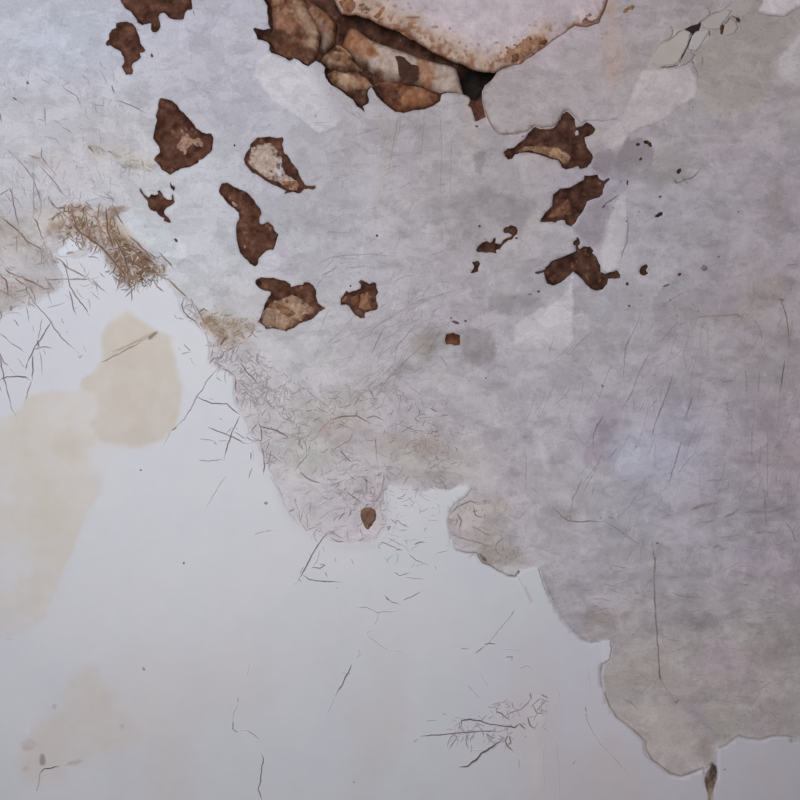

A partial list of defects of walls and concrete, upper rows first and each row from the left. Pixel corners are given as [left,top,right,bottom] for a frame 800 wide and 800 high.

spalling [106,0,192,75]
spalling [253,0,497,134]
spalling [114,98,213,262]
spalling [244,137,316,194]
peeling [470,0,800,352]
spalling [219,183,325,332]
crack [0,291,89,418]
damp [0,307,187,641]
peeling [0,235,800,800]
damp [3,658,148,797]
crack [413,673,575,797]